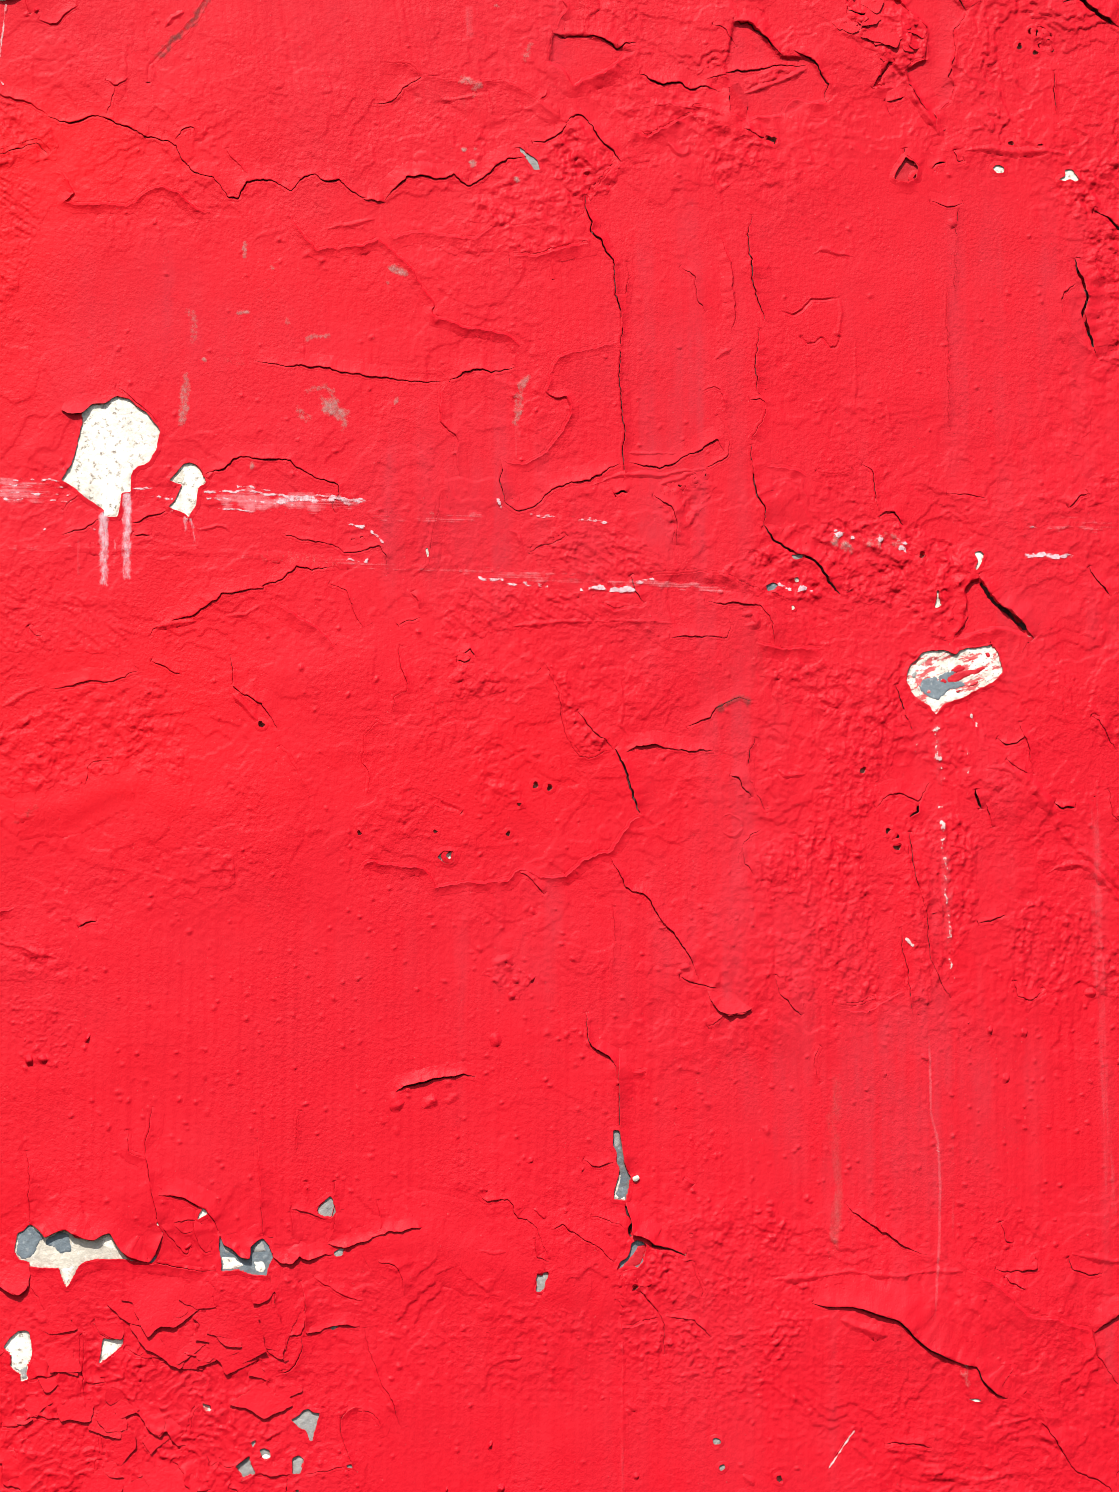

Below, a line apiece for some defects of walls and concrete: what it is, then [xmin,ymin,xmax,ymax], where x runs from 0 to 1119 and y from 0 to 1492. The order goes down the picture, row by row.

peeling [704,0,983,150]
crack [930,70,1070,256]
water stain [0,478,68,501]
peeling [57,383,210,522]
water stain [205,486,362,512]
crack [2,59,916,708]
crack [534,568,821,876]
crack [857,764,963,1016]
spalling [710,518,1119,1029]
spalling [0,1138,429,1492]
spalling [476,1009,1076,1492]
crack [842,1194,931,1259]